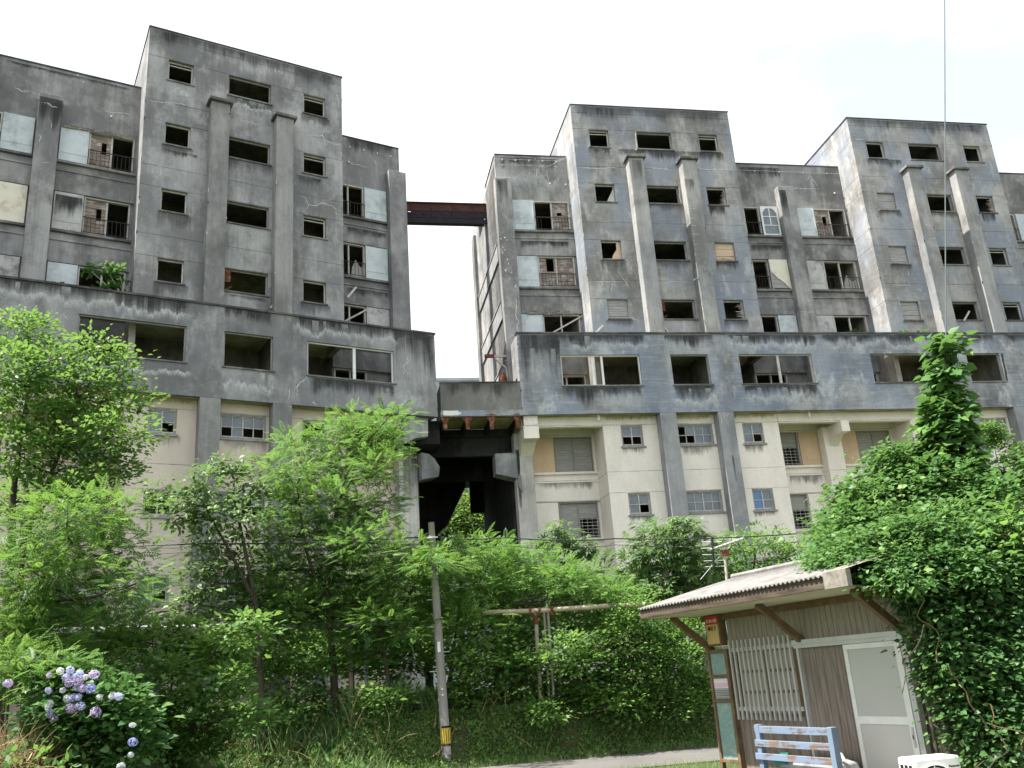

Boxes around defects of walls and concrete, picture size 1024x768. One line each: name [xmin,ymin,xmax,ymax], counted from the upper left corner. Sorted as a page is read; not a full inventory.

leakage [0,277,186,318]
leakage [226,307,270,320]
leakage [300,317,433,364]
leakage [665,335,710,346]
leakage [727,335,932,350]
leakage [314,377,416,409]
leakage [745,385,816,402]